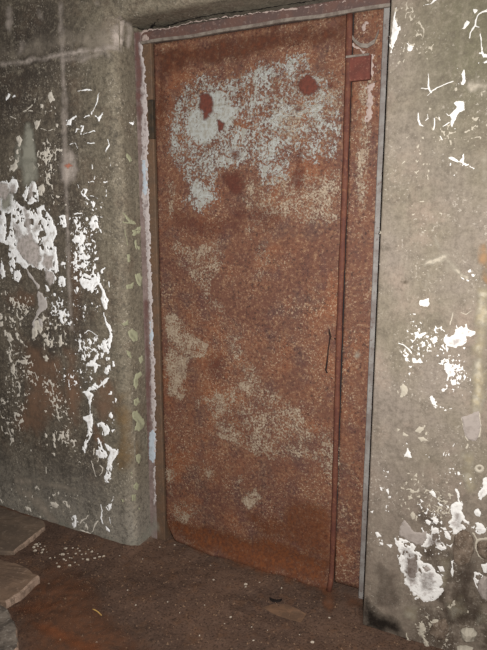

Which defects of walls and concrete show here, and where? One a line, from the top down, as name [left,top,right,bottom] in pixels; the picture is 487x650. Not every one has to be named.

peeling [389,2,434,64]
peeling [66,97,103,134]
rust [199,94,213,120]
peeling [163,52,344,240]
rust [299,74,319,95]
peeling [432,101,487,169]
peeling [122,6,309,504]
peeling [0,136,123,483]
peeling [398,314,475,397]
peeling [49,492,114,534]
peeling [371,471,487,609]
peeling [415,615,448,649]